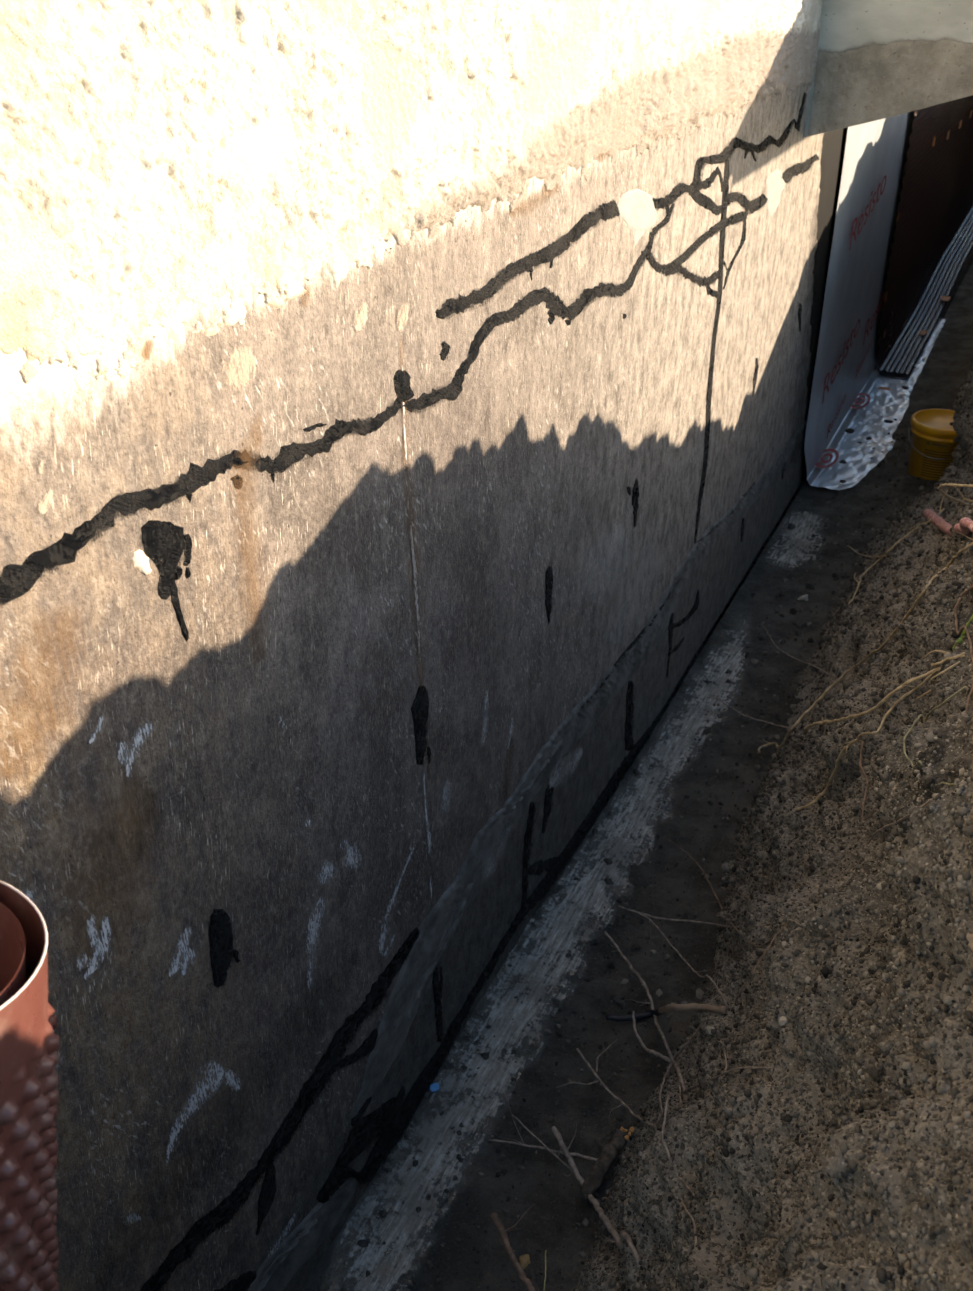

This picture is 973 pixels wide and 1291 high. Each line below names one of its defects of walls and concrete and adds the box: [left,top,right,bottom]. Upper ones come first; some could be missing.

crack [0,92,819,605]
crack [625,681,635,751]
crack [666,589,700,678]
crack [140,927,444,1291]